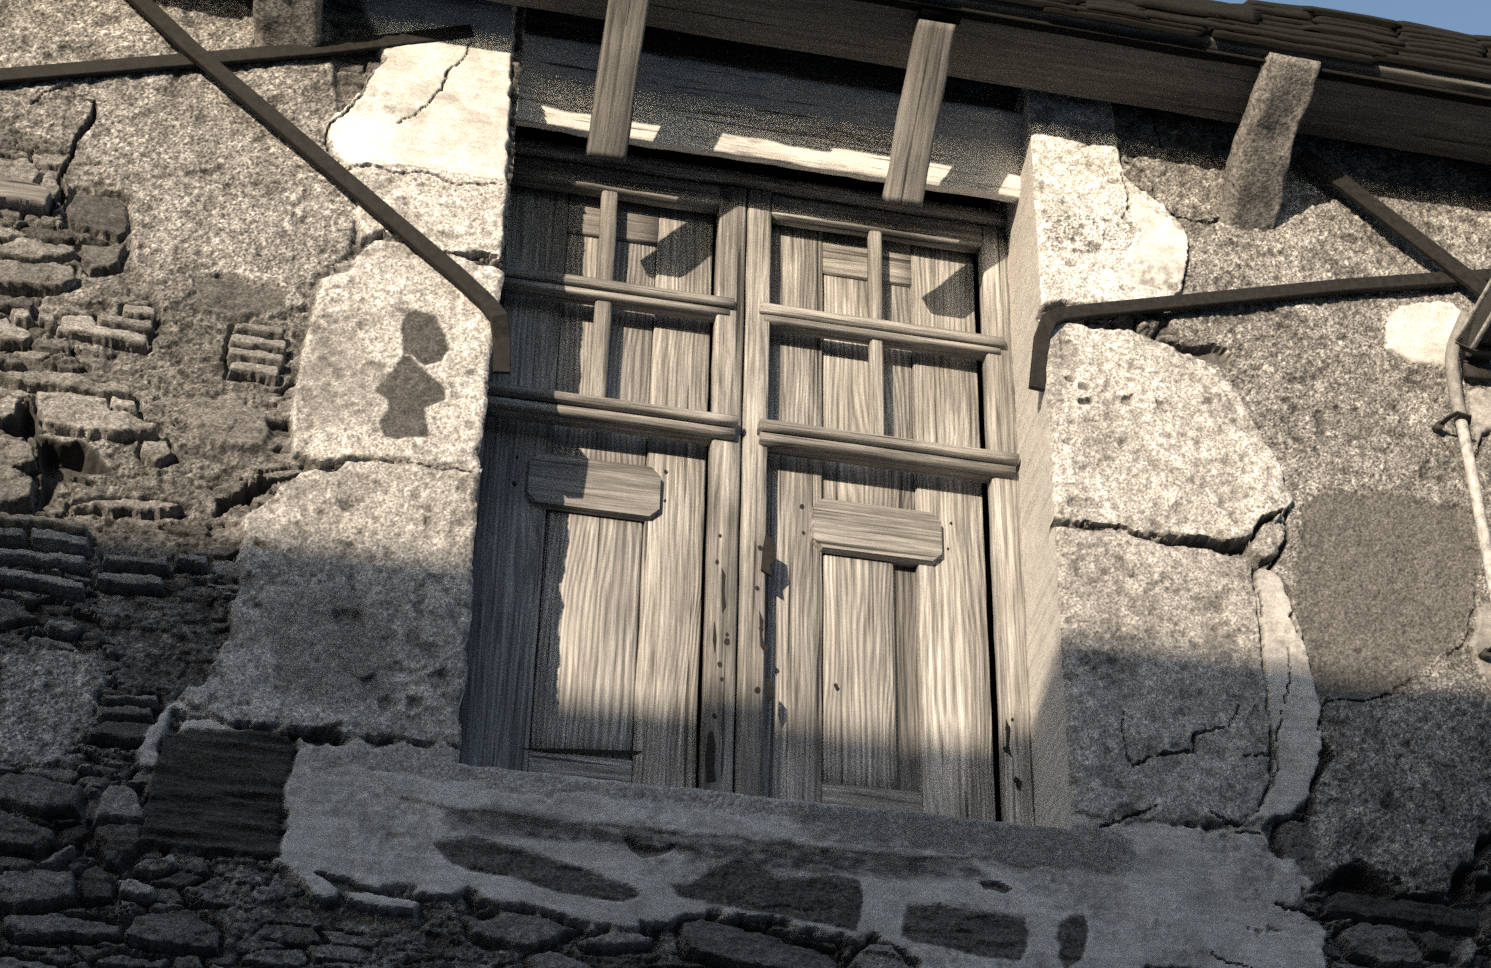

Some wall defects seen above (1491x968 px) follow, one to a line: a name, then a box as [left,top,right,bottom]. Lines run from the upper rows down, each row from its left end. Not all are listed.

crack [398,38,474,124]
crack [325,56,504,186]
peeling [1,395,122,513]
spalling [336,496,361,513]
spalling [254,537,271,550]
crack [1446,568,1478,657]
spalling [359,664,450,713]
crack [1074,506,1417,835]
spalling [311,719,344,742]
flaking render [625,838,679,859]
peeling [301,870,436,914]
flaking render [980,880,1013,894]